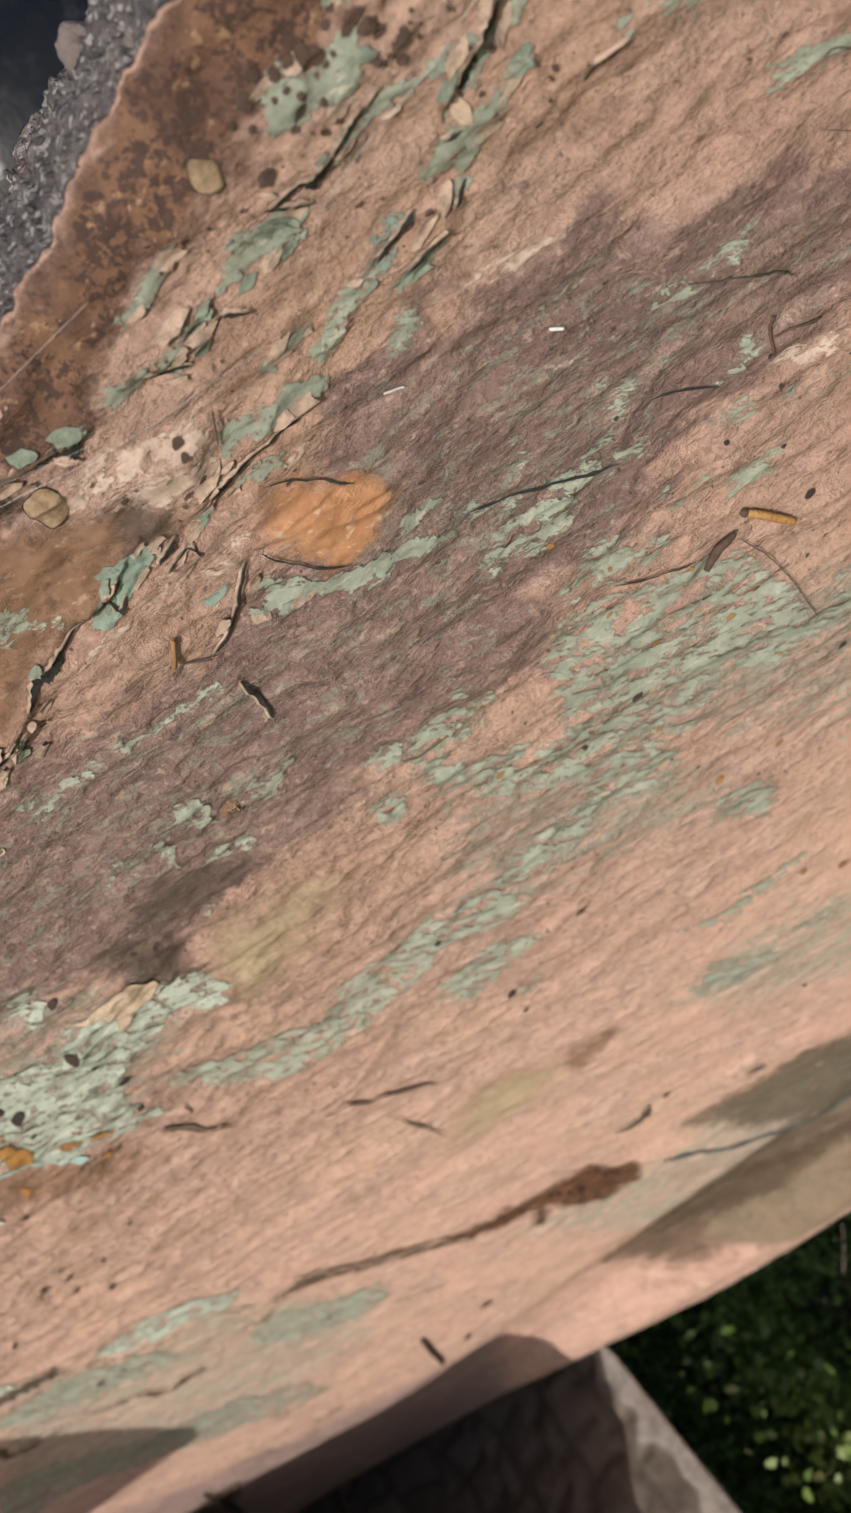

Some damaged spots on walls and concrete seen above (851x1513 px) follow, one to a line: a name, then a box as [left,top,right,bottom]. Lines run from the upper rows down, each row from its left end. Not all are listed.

spalling [0,0,174,324]
water stain [0,0,423,472]
peeling [249,0,537,206]
water stain [0,490,168,731]
water stain [172,436,207,509]
rust [263,477,391,565]
peeling [234,324,691,624]
peeling [141,527,851,1090]
water stain [100,858,255,990]
peeling [0,971,233,1168]
rust [276,1162,642,1298]
water stain [602,1036,851,1263]